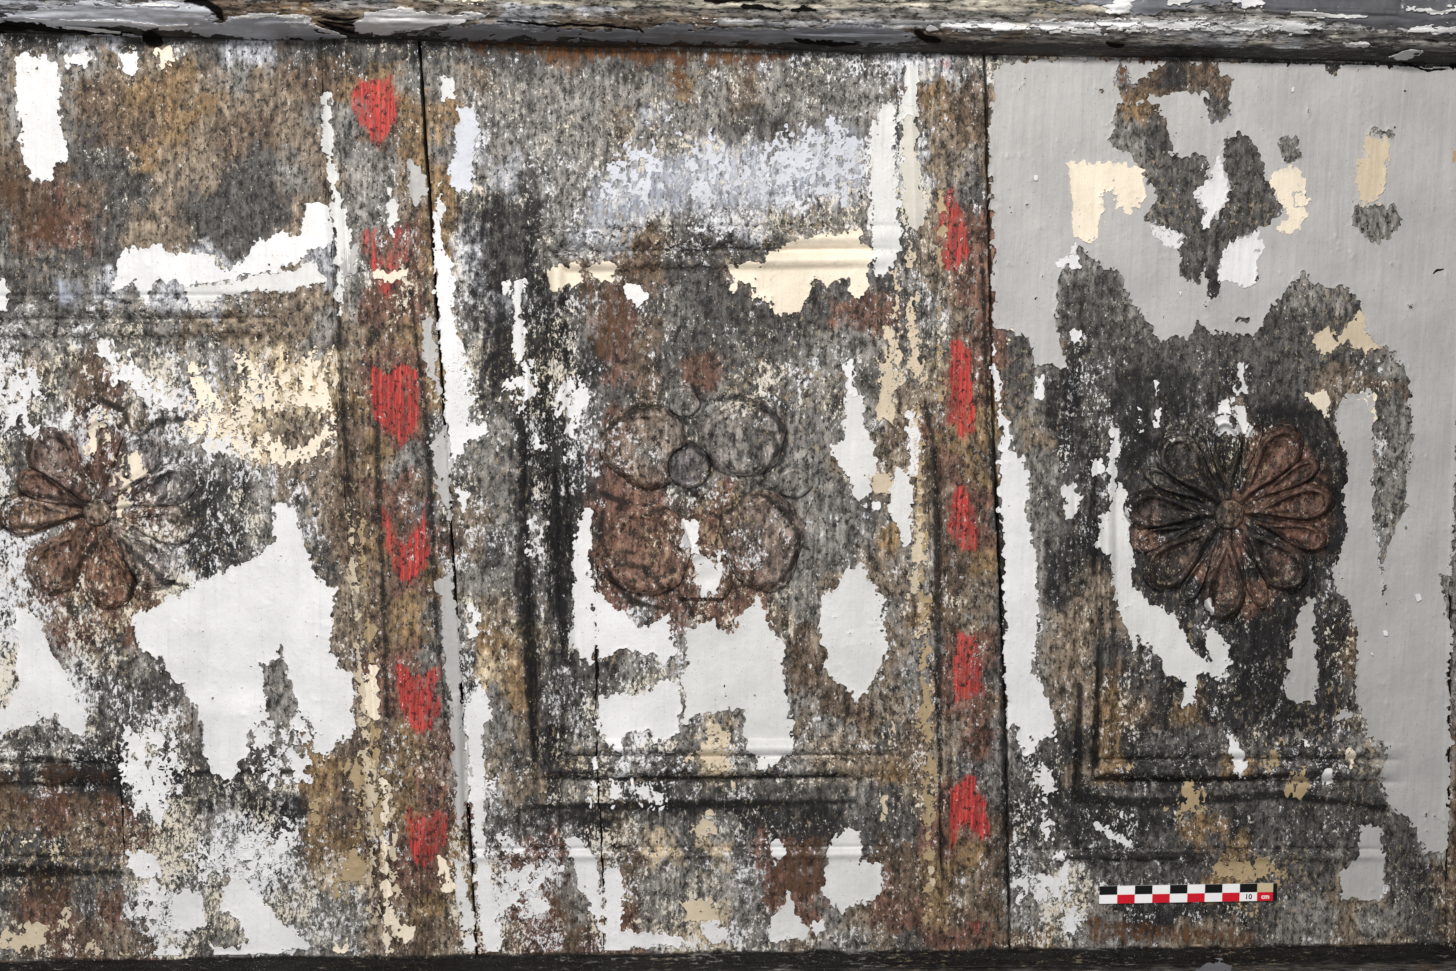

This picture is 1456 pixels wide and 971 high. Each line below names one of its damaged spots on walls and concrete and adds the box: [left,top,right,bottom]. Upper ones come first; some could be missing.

peeling [109,91,408,317]
peeling [385,74,596,523]
peeling [547,260,649,308]
peeling [0,0,1456,184]
peeling [0,331,339,529]
peeling [524,506,550,562]
peeling [568,63,950,944]
peeling [987,49,1456,942]
peeling [0,607,89,740]
peeling [85,502,416,956]
peeling [434,563,729,952]
peeling [0,905,72,957]